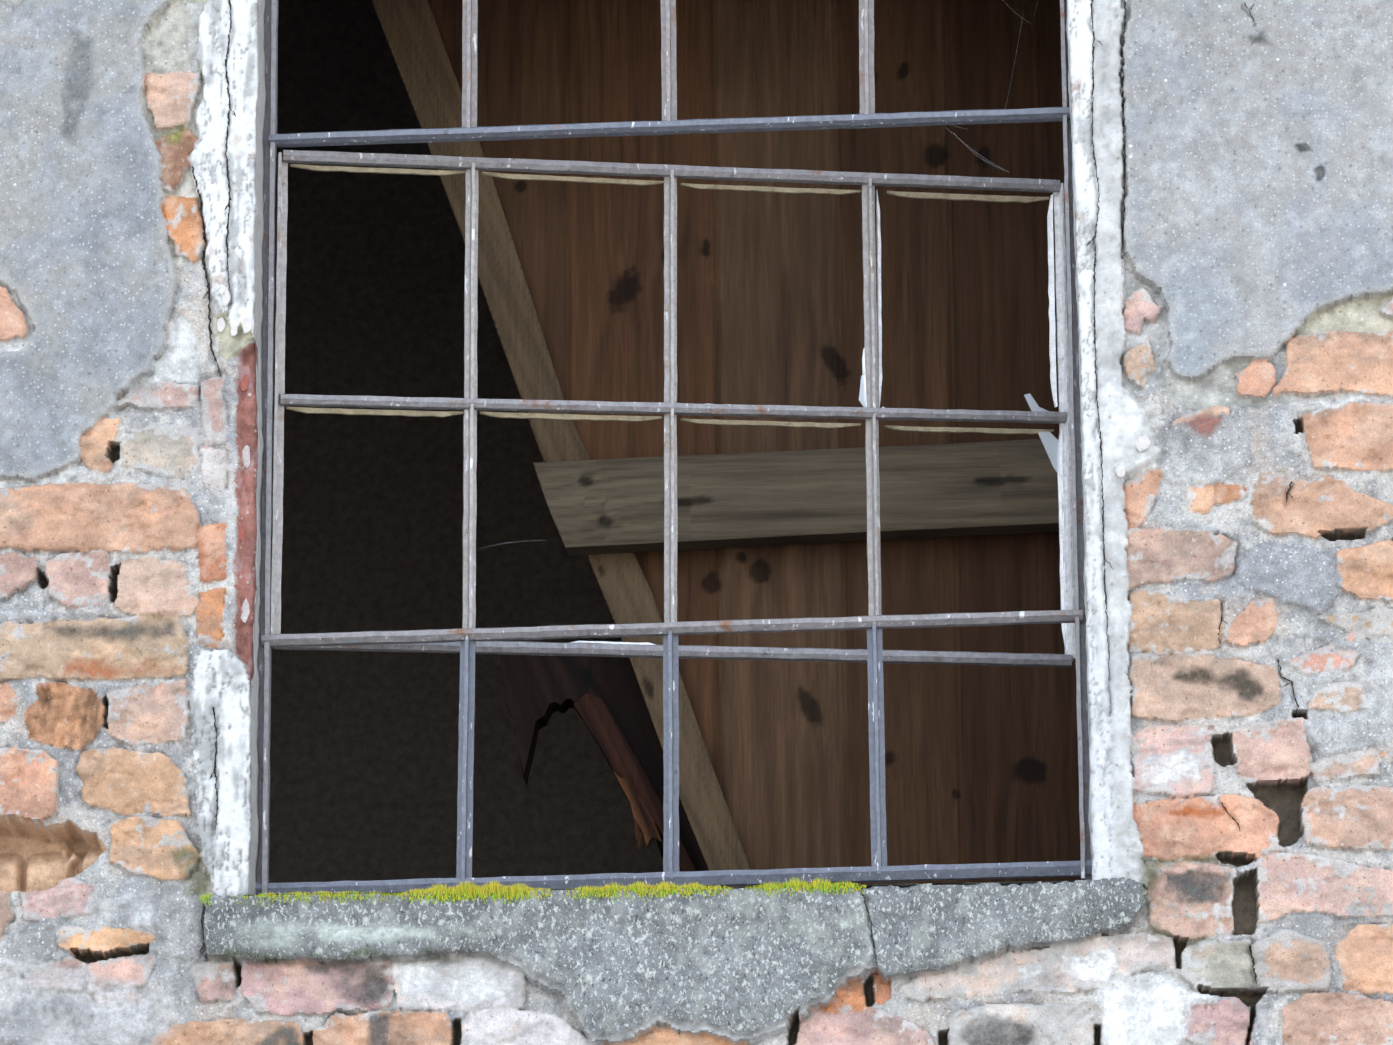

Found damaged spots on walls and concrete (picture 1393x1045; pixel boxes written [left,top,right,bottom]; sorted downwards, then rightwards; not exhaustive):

crack [192,0,236,377]
crack [1086,0,1127,715]
peeling [215,287,258,681]
peeling [1319,526,1368,541]
spalling [26,682,109,750]
peeling [1211,731,1238,767]
peeling [1247,775,1309,847]
spalling [0,813,107,894]
crack [862,888,878,967]
peeling [1174,935,1189,969]
peeling [1216,850,1261,935]
peeling [1198,984,1269,1045]